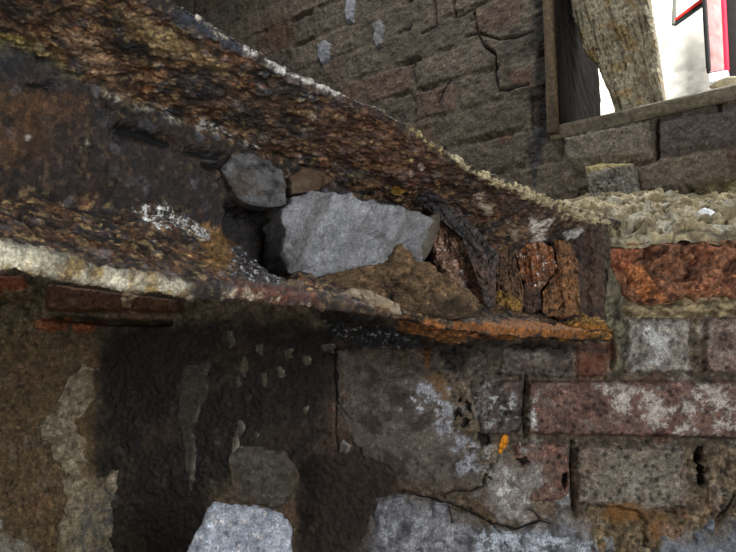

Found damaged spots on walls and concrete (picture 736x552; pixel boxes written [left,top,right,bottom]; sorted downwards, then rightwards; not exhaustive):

crack [424,0,532,92]
water stain [223,289,261,301]
rust [392,320,527,345]
rust [549,313,612,343]
water stain [80,302,503,552]
crack [334,348,352,452]
water stain [411,383,529,514]
crack [403,463,555,545]
crack [514,379,526,434]
crack [564,442,573,513]